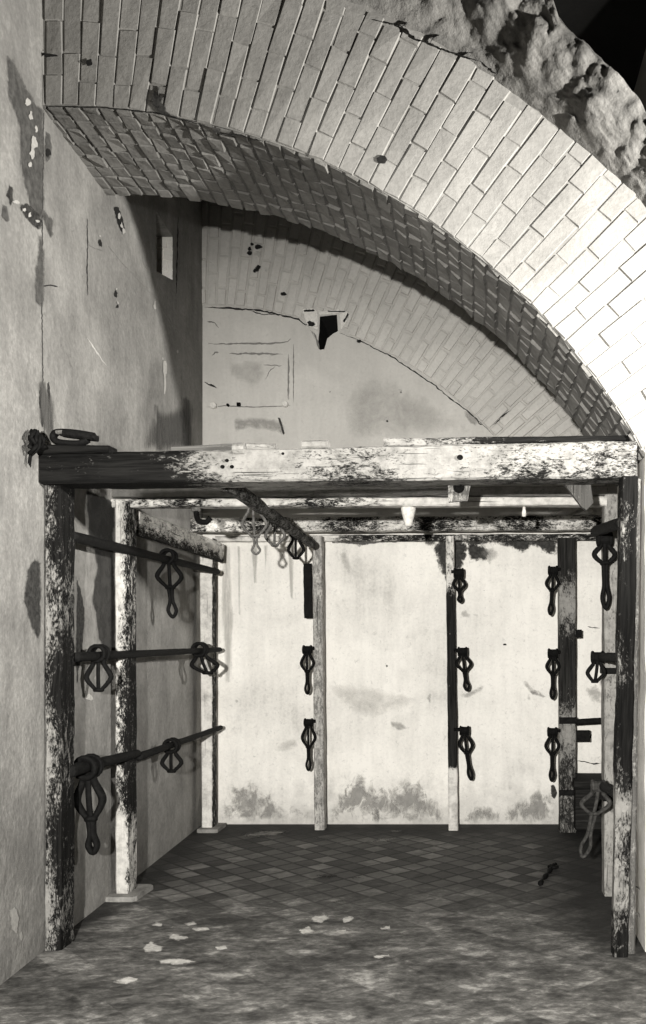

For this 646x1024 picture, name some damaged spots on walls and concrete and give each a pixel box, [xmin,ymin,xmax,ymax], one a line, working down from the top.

crack [383,22,493,72]
leakage [7,58,53,305]
peeling [2,186,42,229]
leakage [232,789,275,817]
leakage [336,781,439,820]
leakage [509,785,557,819]